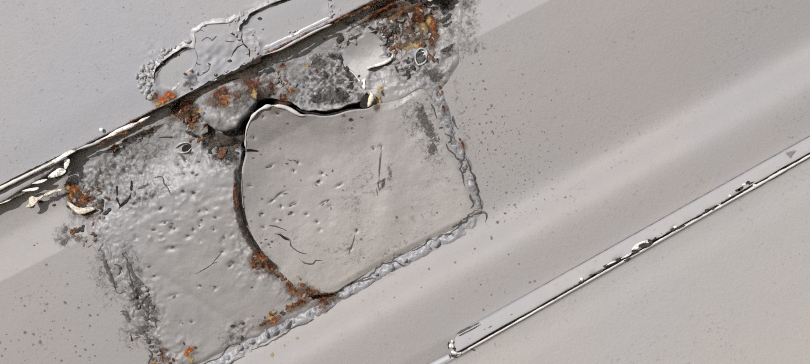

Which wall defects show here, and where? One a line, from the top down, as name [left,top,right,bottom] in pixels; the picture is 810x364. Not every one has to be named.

rust [334,0,436,50]
peeling [333,0,449,92]
rust [153,78,273,129]
peeling [150,0,332,162]
peeling [0,116,155,208]
rust [66,184,91,215]
peeling [65,174,111,247]
peeling [133,287,156,327]
peeling [252,233,328,319]
rust [286,276,332,309]
peeling [128,332,162,362]